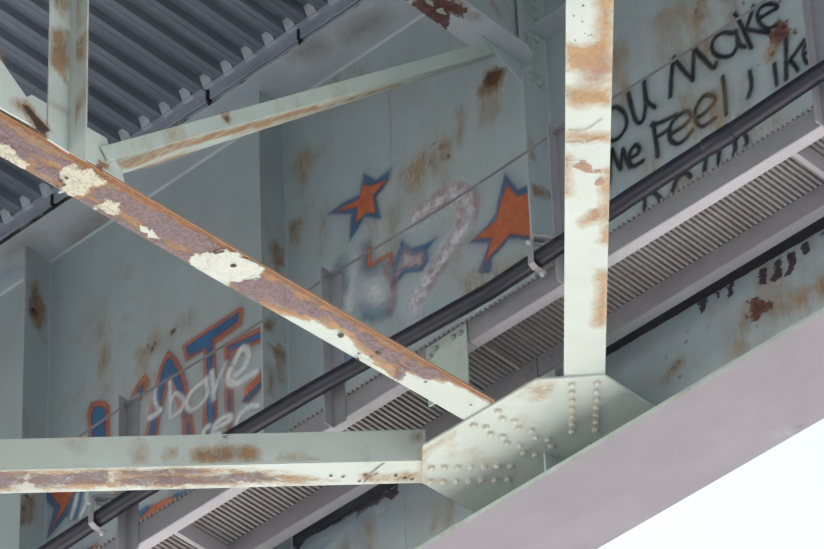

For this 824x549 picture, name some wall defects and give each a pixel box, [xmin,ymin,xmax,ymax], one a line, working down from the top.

corrosion [52,30,67,72]
corrosion [482,66,503,92]
corrosion [567,0,613,104]
corrosion [768,20,797,56]
peeling [0,123,70,187]
peeling [79,187,225,261]
corrosion [0,106,494,404]
corrosion [581,169,610,243]
peeling [231,274,453,383]
corrosion [595,273,607,324]
corrosion [742,297,773,327]
corrosion [0,448,317,523]